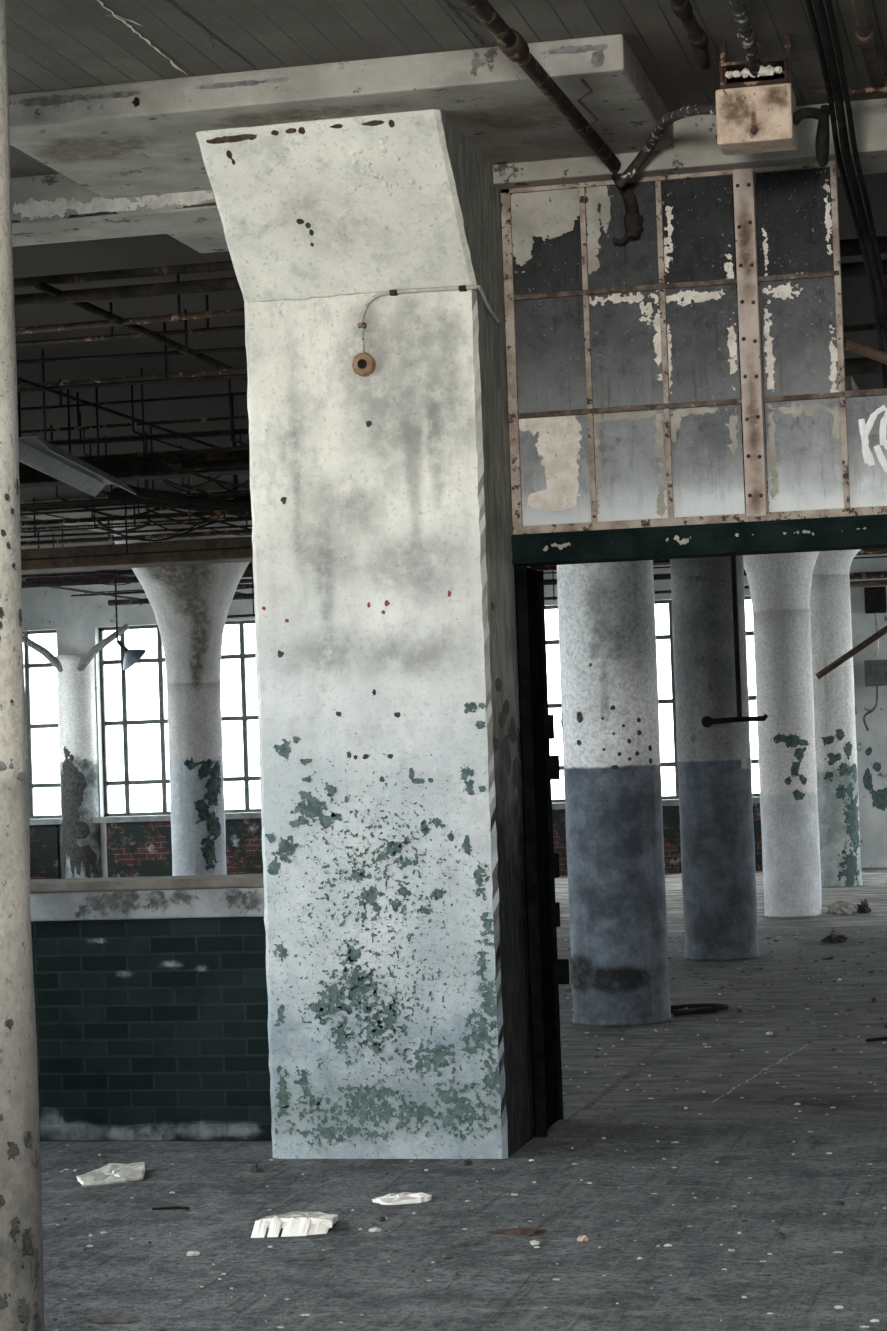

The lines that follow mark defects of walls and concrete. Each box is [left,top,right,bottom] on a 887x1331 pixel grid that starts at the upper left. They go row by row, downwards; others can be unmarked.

peeling [511,186,611,275]
peeling [519,312,739,517]
peeling [589,193,734,394]
corrosion [740,224,750,273]
peeling [762,228,841,500]
peeling [823,170,833,255]
peeling [61,746,97,879]
peeling [184,757,222,873]
peeling [771,729,887,887]
peeling [265,678,523,1148]